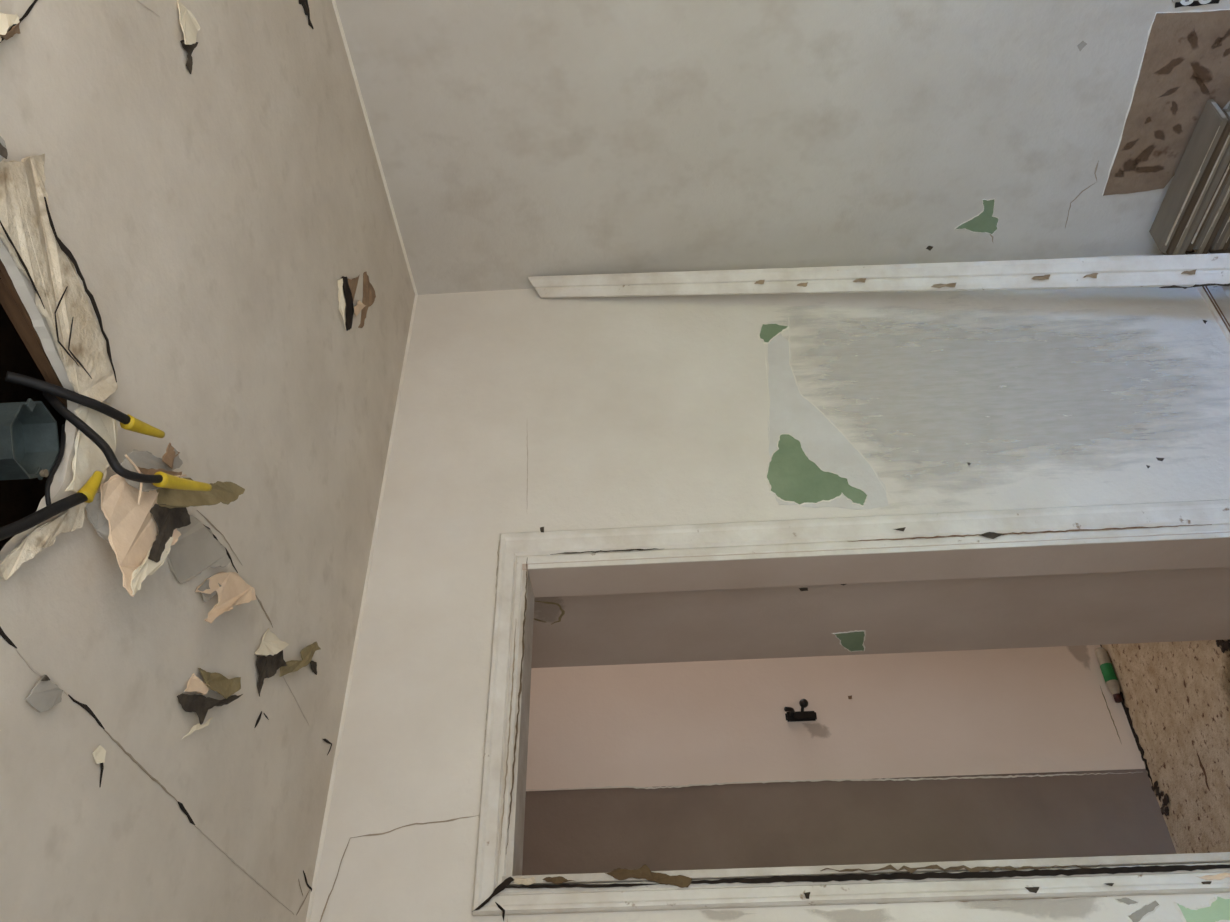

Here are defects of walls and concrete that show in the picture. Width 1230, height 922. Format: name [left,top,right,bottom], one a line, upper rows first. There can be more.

crack [0,0,38,43]
peeling [954,198,999,242]
peeling [338,272,376,331]
peeling [757,314,889,510]
peeling [85,443,256,623]
crack [197,510,242,573]
peeling [255,628,321,696]
peeling [831,630,866,652]
peeling [177,668,243,739]
crack [0,546,528,922]
peeling [1105,873,1230,922]